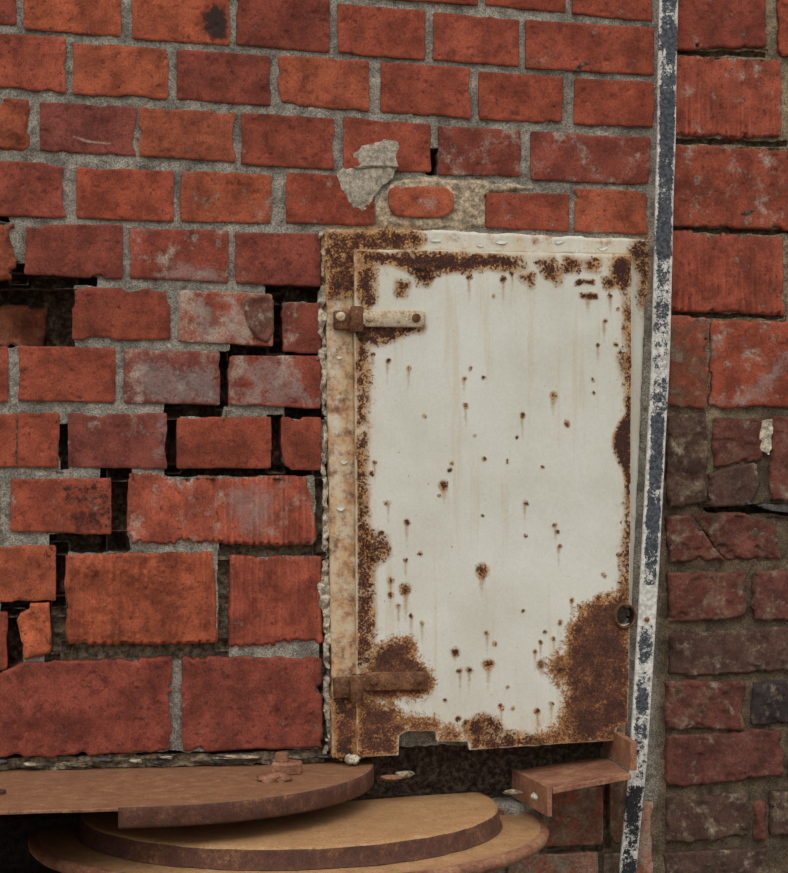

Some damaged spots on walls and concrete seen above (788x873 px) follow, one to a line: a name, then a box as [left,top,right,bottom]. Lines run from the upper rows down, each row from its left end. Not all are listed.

spalling [0,276,78,348]
crack [1,280,327,666]
rust [320,224,652,761]
crack [699,502,783,518]
crack [317,632,330,753]